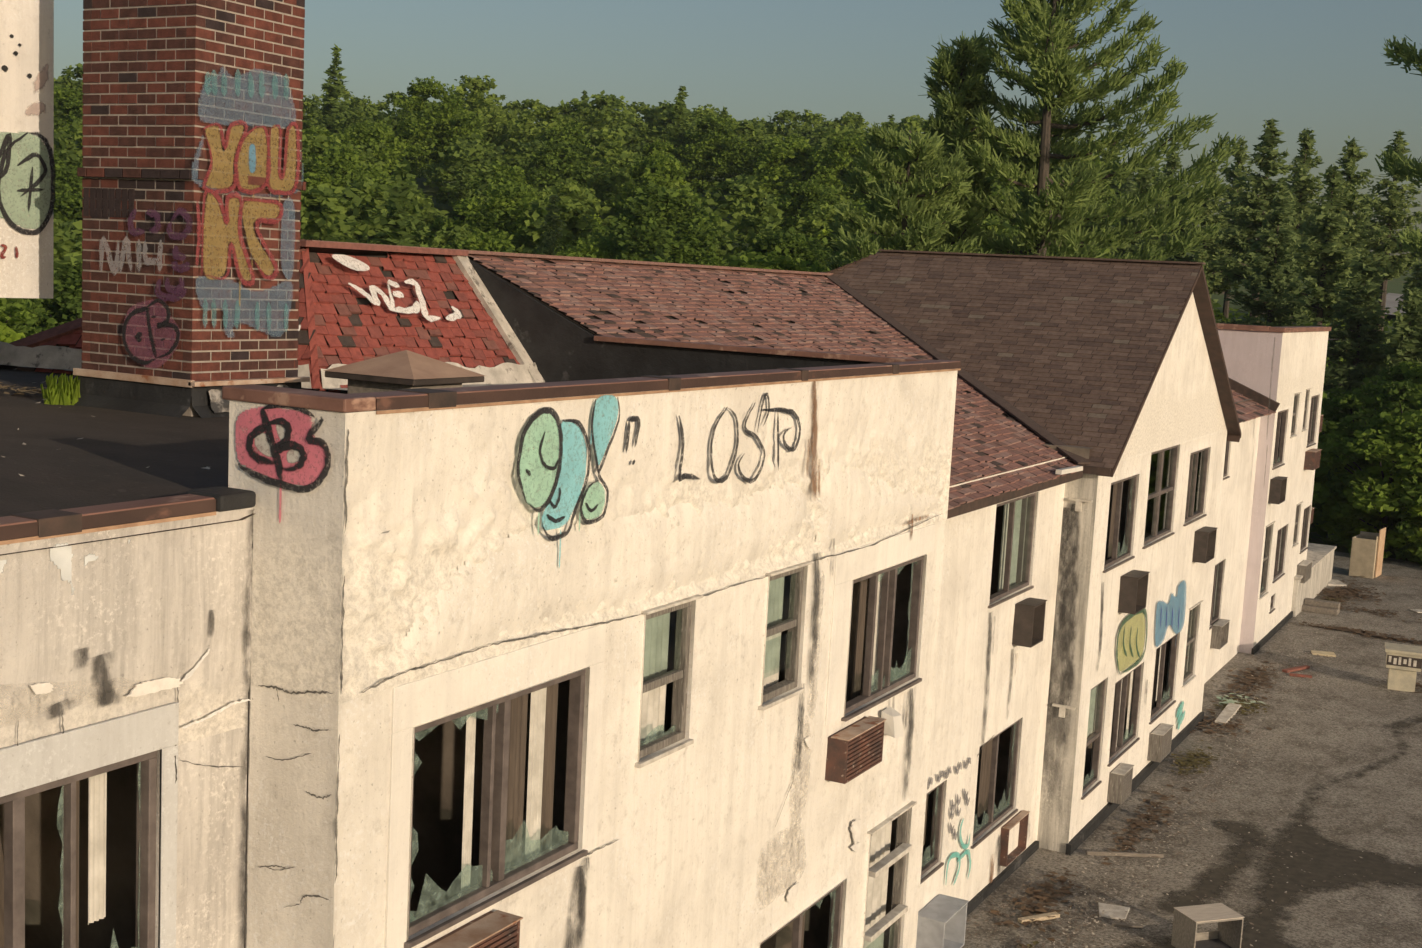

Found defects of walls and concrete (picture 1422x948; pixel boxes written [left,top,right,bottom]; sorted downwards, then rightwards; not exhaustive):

crack [342,429,350,530]
crack [814,514,941,561]
peeling [50,543,98,595]
crack [703,576,767,596]
leakage [810,553,833,675]
leakage [1046,504,1078,741]
spalling [0,682,95,717]
leakage [51,702,64,718]
leakage [80,648,114,705]
spalling [125,677,183,697]
crack [174,576,643,907]
leakage [566,866,586,948]